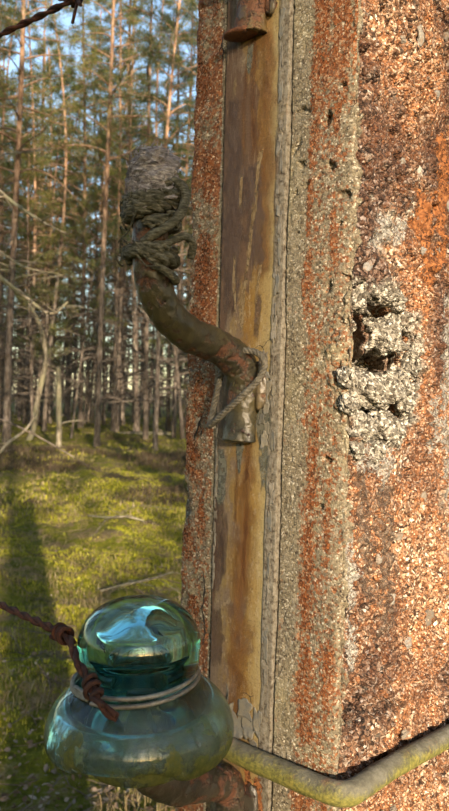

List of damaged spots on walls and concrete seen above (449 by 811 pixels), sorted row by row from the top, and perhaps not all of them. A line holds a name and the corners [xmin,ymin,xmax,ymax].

peeling [270,120,283,343]
rust [407,132,449,289]
spalling [323,273,431,464]
peeling [226,684,267,748]